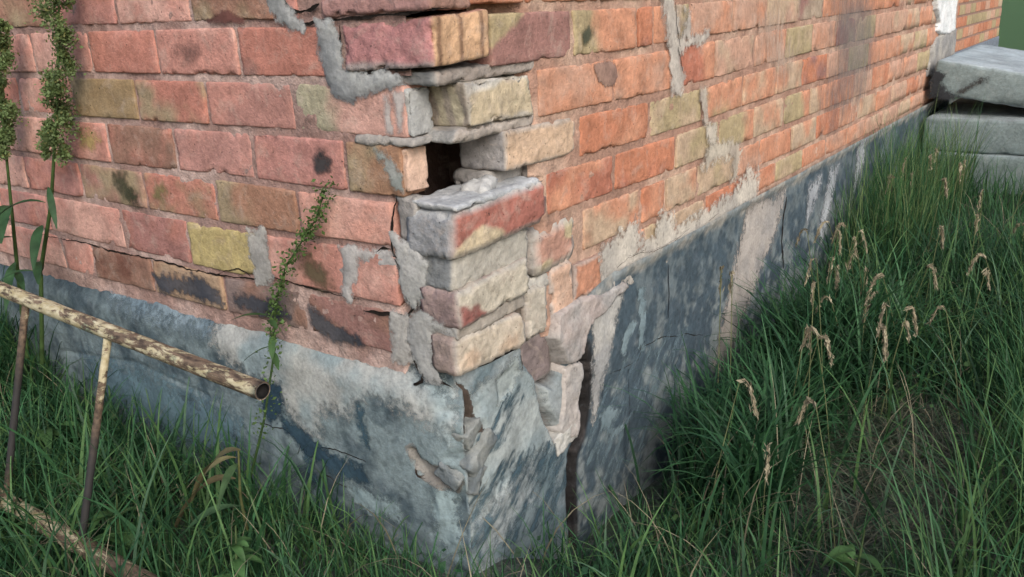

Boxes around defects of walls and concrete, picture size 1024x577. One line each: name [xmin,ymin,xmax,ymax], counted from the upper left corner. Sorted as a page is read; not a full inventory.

crack [42,234,451,387]
peeling [110,282,629,568]
crack [377,195,400,271]
leakage [586,138,760,503]